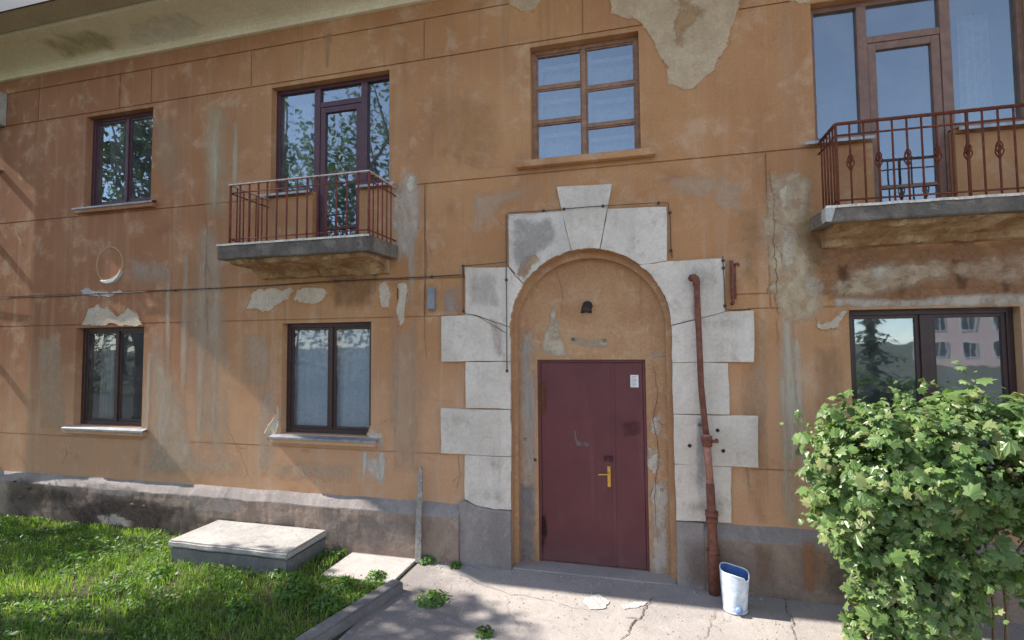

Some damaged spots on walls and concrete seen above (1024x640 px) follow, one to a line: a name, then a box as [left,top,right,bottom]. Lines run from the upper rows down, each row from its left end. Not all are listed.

peeling [608,0,743,91]
crack [767,168,783,343]
peeling [79,286,143,327]
peeling [245,286,329,314]
peeling [378,280,410,327]
peeling [815,308,850,331]
damp [761,173,1024,520]
crack [649,368,663,537]
crack [620,597,654,640]